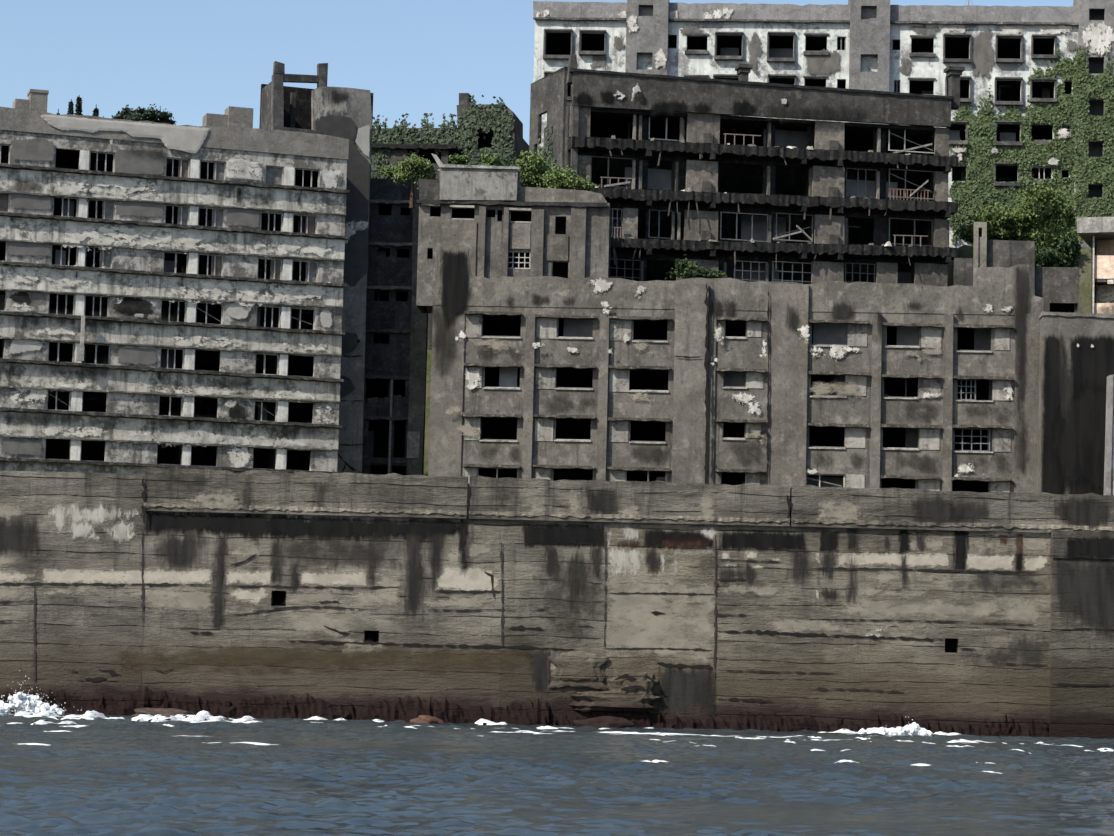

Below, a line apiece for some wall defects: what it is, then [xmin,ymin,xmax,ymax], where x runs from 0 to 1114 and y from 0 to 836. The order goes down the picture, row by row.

peeling [590,11,639,70]
peeling [655,48,667,70]
peeling [668,7,733,35]
peeling [0,114,219,288]
peeling [135,277,360,354]
leakage [432,250,468,373]
spalling [732,392,764,444]
spalling [797,325,860,361]
leakage [966,266,1029,471]
leakage [1041,335,1114,635]
leakage [0,483,468,628]
crack [0,478,1114,703]